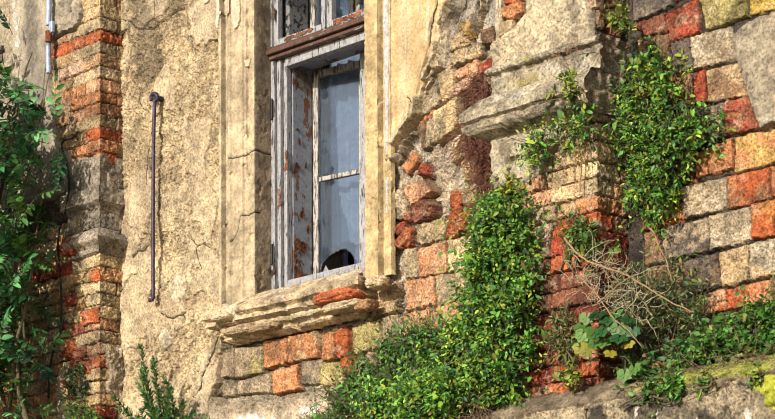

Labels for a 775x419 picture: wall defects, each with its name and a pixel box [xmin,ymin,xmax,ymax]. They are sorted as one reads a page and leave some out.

spalling [51,0,125,172]
peeling [204,0,241,30]
crack [420,0,480,85]
spalling [210,0,775,403]
spalling [18,196,125,419]
crack [192,336,219,398]